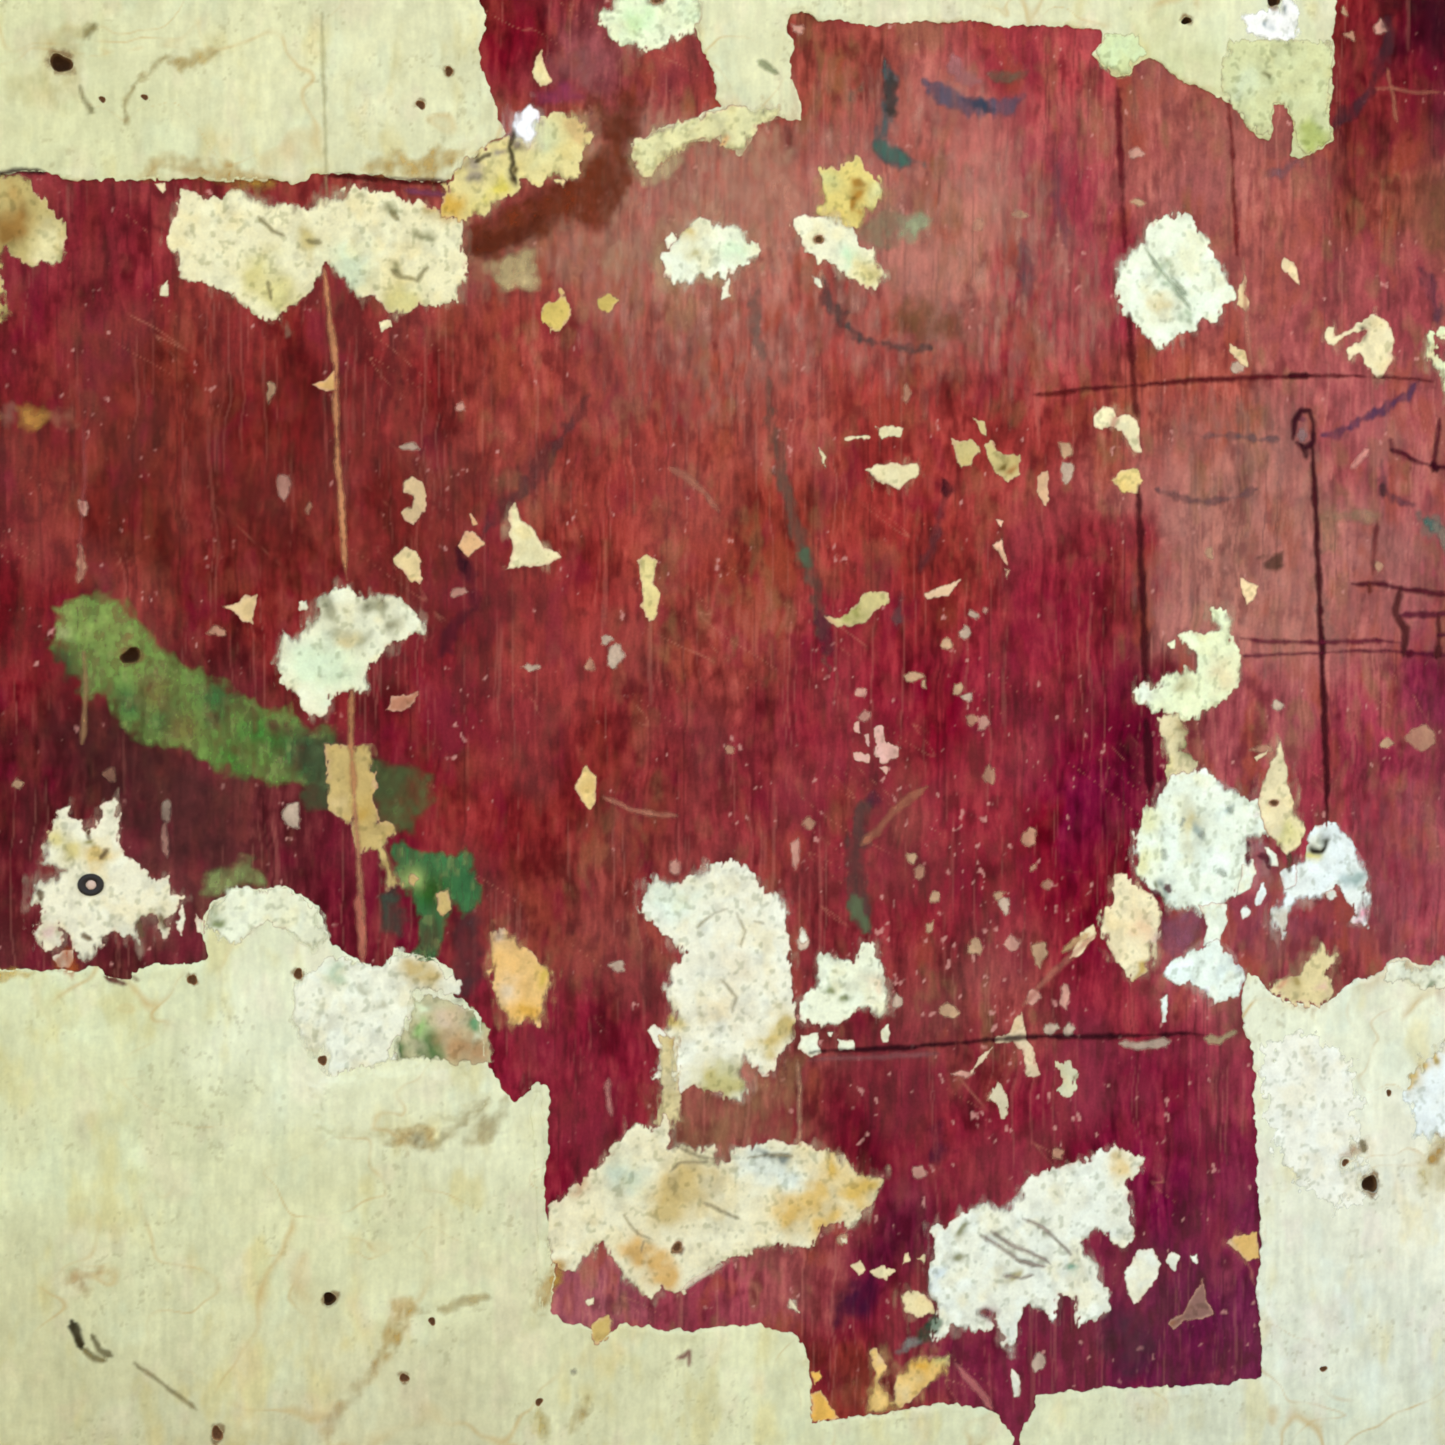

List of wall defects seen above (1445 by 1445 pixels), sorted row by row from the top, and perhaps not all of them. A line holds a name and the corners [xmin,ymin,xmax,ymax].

peeling [440,111,594,222]
spalling [166,172,562,321]
spalling [1114,212,1236,349]
spalling [277,585,426,717]
spalling [1132,607,1241,722]
spalling [31,798,186,960]
spalling [1132,768,1267,946]
spalling [1270,821,1371,940]
spalling [641,858,796,1102]
spalling [799,941,886,1028]
spalling [547,1113,883,1299]
spalling [928,1143,1145,1347]